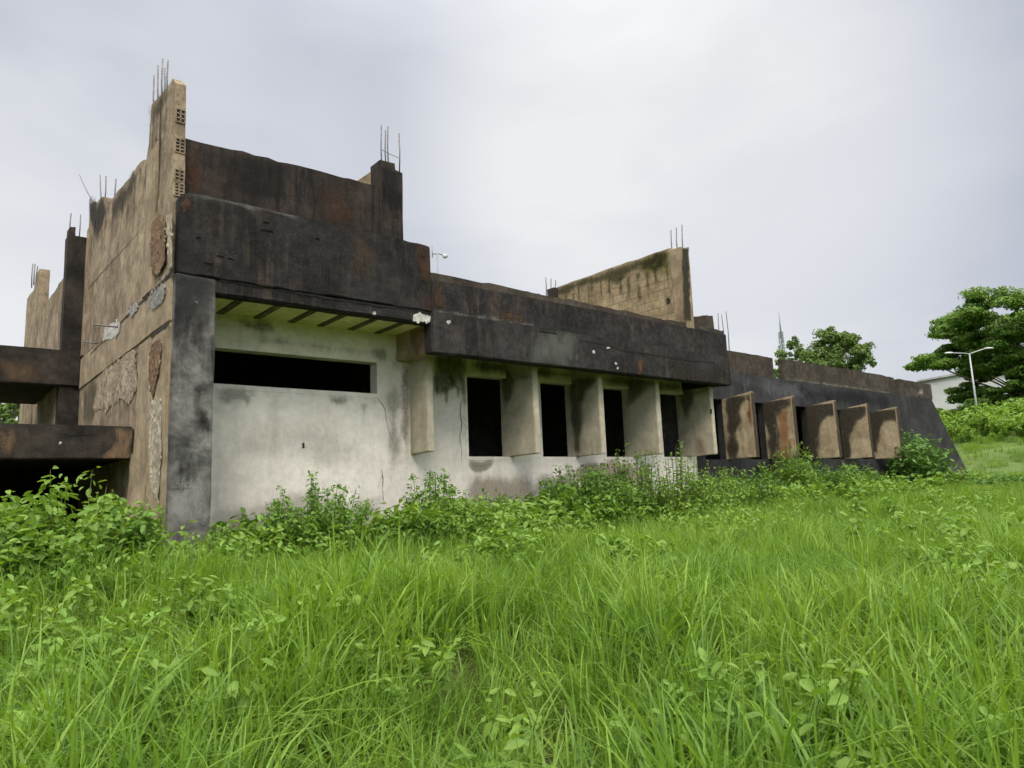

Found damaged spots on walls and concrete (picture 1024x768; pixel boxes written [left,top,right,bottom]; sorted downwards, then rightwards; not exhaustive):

flaking render [84,211,173,344]
water stain [559,252,668,300]
flaking render [93,339,162,504]
water stain [171,478,207,520]
water stain [470,461,648,512]